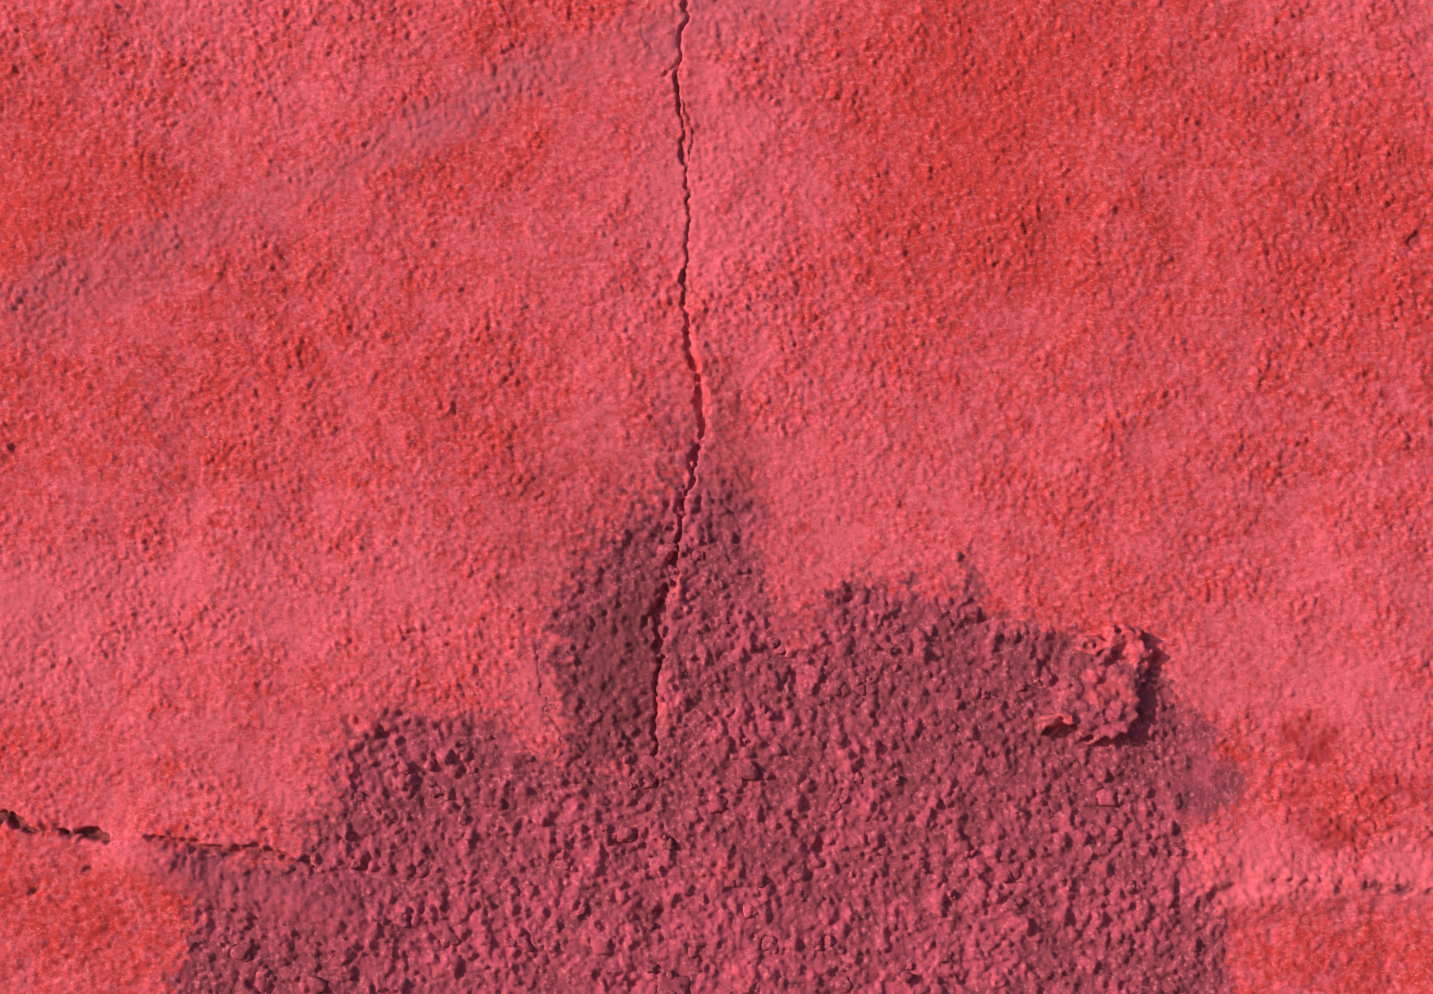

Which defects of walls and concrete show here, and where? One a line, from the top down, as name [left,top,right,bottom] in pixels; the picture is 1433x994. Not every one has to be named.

crack [661,74,695,306]
damp [433,285,803,803]
crack [0,809,318,870]